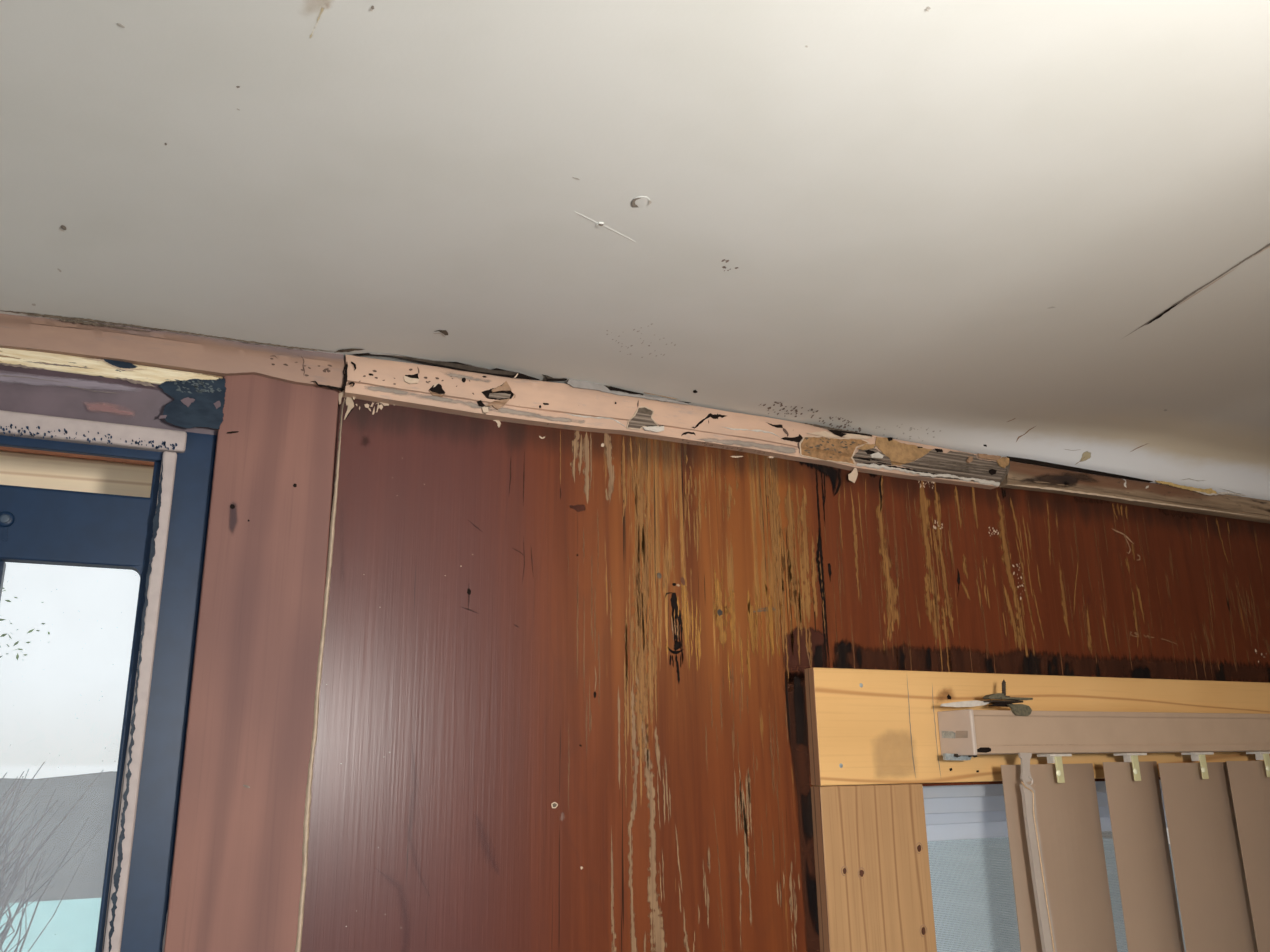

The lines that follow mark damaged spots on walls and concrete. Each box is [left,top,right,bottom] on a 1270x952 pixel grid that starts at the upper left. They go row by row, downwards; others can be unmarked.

crack [1125,243,1270,337]
peeling [566,402,664,433]
peeling [799,423,1009,486]
leakage [560,430,1270,952]